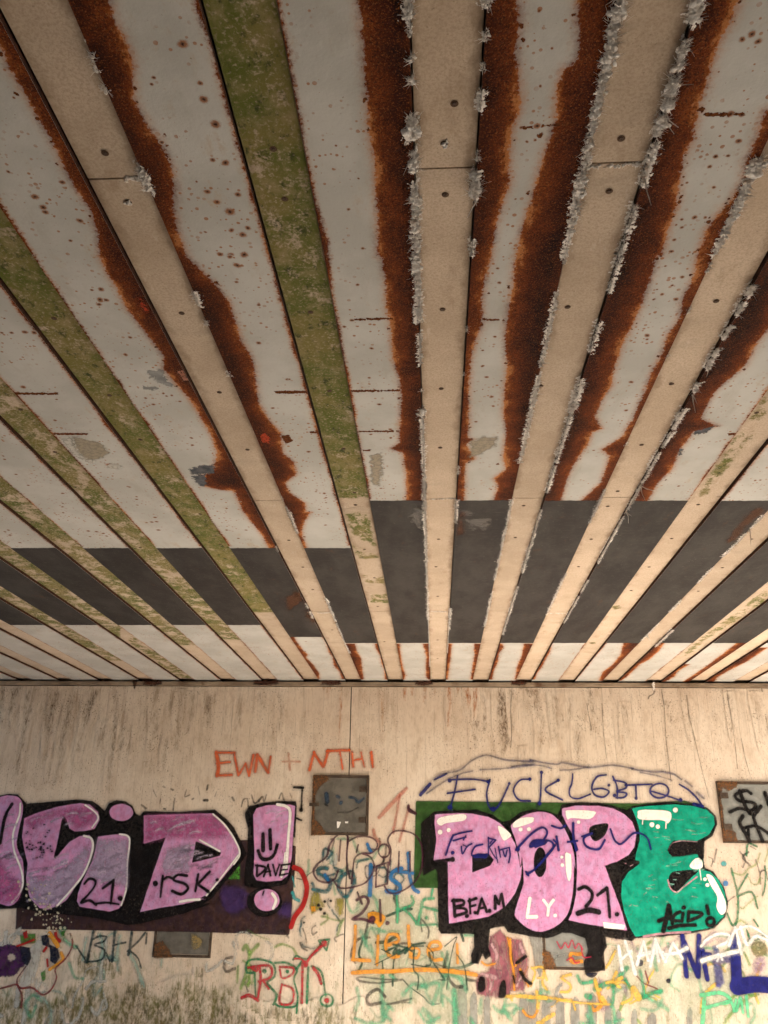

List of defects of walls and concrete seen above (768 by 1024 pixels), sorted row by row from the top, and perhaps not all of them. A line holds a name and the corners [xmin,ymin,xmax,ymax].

corrosion [0,0,350,548]
corrosion [277,0,424,501]
damp [397,0,420,89]
damp [401,110,427,367]
damp [415,405,460,666]
corrosion [457,0,617,501]
damp [514,287,561,464]
damp [543,375,587,493]
damp [560,0,711,295]
corrosion [545,0,768,501]
damp [597,280,761,564]
damp [705,151,768,273]